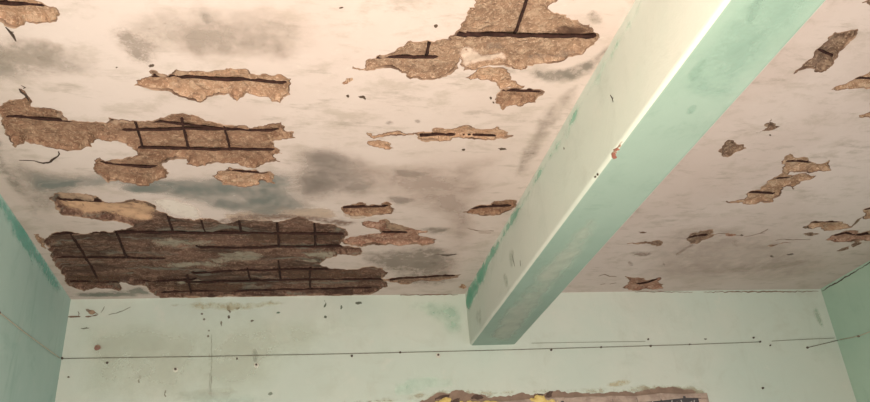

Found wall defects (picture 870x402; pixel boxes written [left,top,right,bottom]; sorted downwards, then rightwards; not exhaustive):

spalling [0,0,60,29]
damp [0,47,62,76]
damp [121,32,150,60]
spalling [342,0,600,110]
spalling [794,29,858,74]
spalling [0,89,295,187]
spalling [366,125,513,151]
damp [0,151,369,214]
damp [0,202,57,287]
spalling [34,192,467,326]
damp [371,249,448,282]
damp [79,288,148,297]